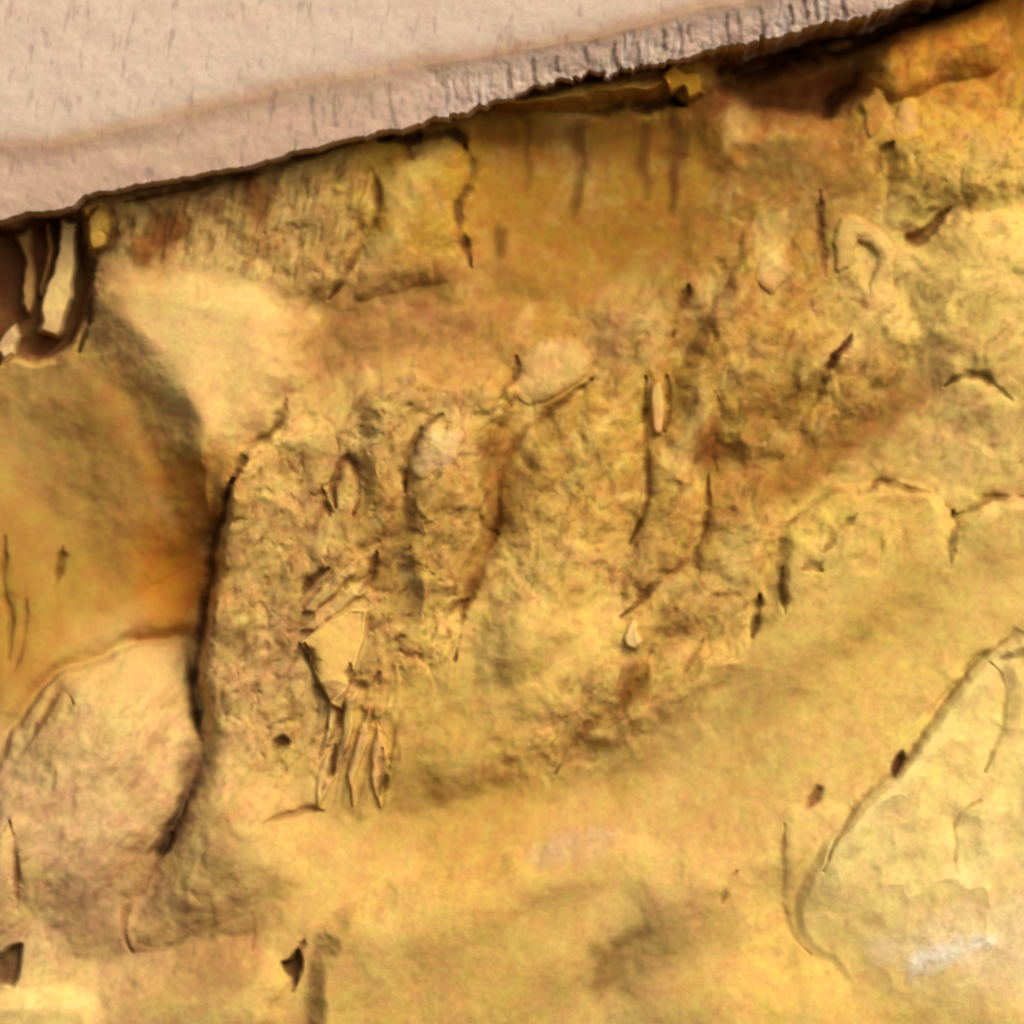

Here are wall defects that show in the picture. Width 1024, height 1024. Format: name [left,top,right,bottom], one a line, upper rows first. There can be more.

damp [668,109,688,208]
crack [188,420,282,733]
spalling [199,371,518,813]
crack [462,579,477,610]
crack [490,519,500,542]